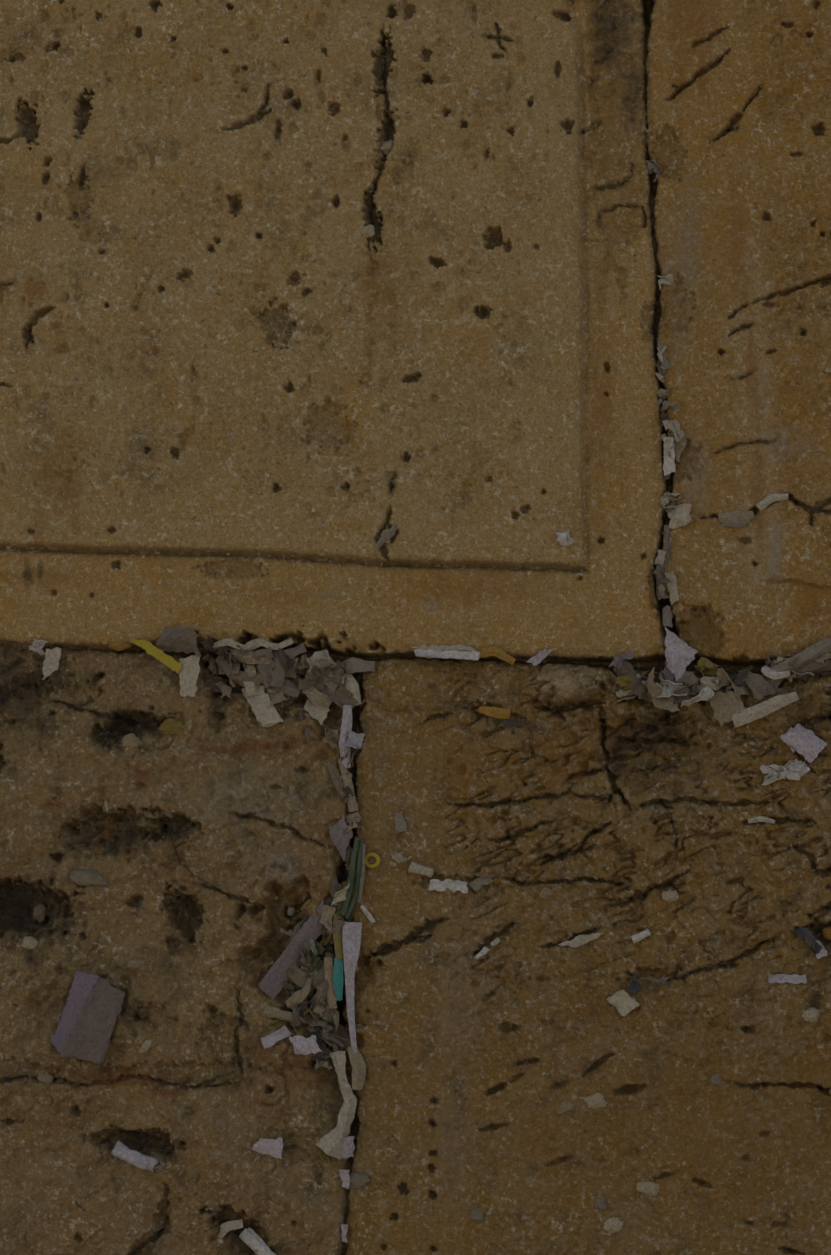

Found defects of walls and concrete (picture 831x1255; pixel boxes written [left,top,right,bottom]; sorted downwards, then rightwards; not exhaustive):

crack [667,28,730,101]
crack [223,83,272,131]
crack [378,88,393,120]
crack [714,88,761,142]
crack [734,276,831,333]
crack [457,700,831,948]
crack [369,918,449,959]
crack [474,922,515,956]
crack [667,939,774,982]
crack [0,987,249,1090]
crack [735,1082,831,1096]
crack [128,1183,172,1255]